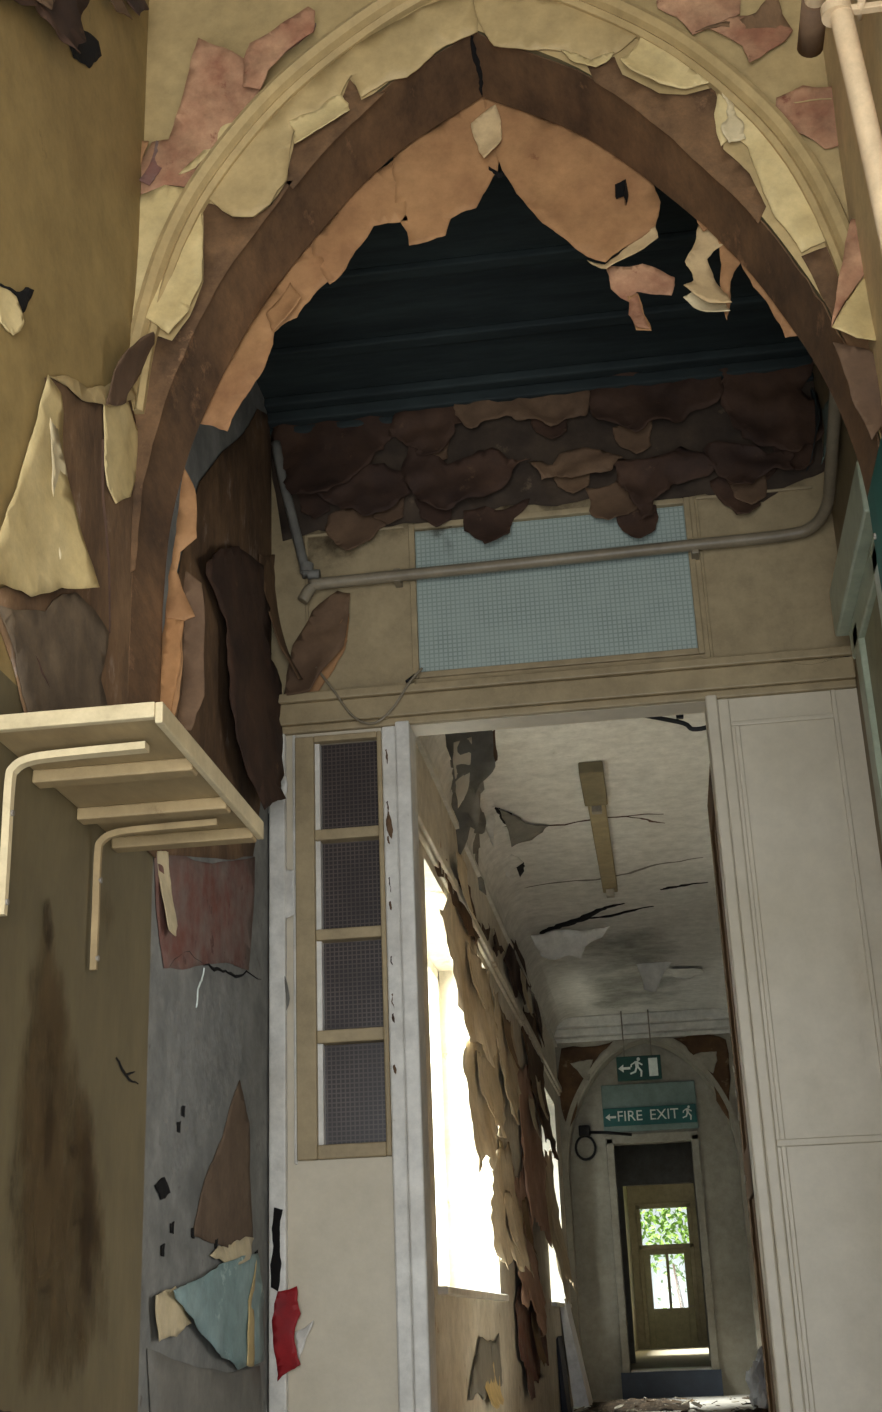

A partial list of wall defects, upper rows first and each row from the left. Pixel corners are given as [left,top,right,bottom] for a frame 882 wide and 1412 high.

peeling [0,0,870,713]
peeling [175,409,429,819]
crack [495,807,662,847]
crack [526,857,708,960]
leakage [21,903,101,1370]
spalling [154,1177,171,1200]
peeling [191,1080,283,1291]